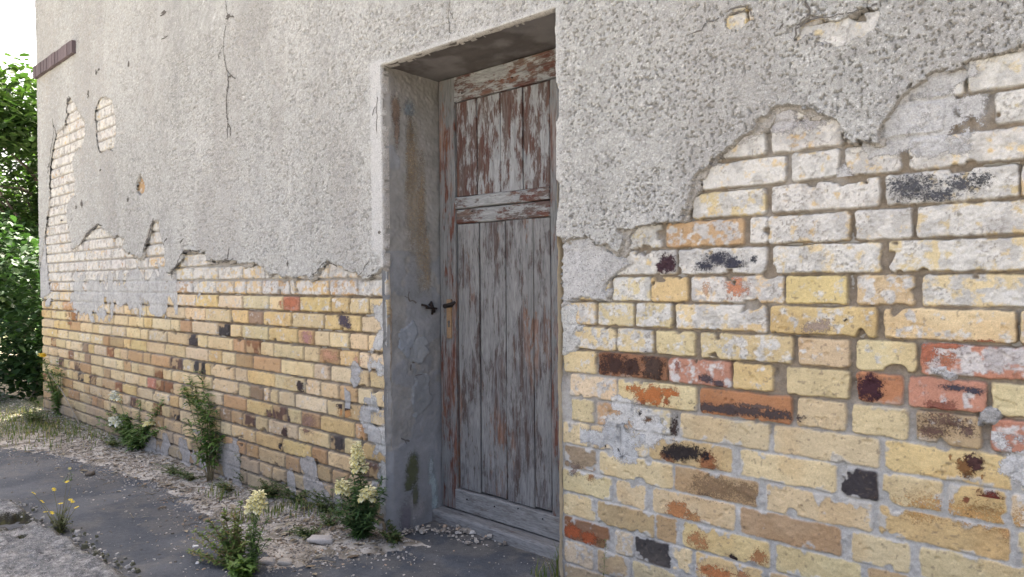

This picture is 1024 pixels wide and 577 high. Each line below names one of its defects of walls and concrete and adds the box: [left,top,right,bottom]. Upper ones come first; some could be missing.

flaking render [66,90,118,153]
crack [218,2,236,140]
flaking render [559,42,1024,356]
flaking render [40,240,54,307]
flaking render [61,219,178,323]
flaking render [184,248,387,282]
flaking render [344,301,429,409]
peeling [300,456,317,483]
flaking render [367,390,388,530]
peeling [606,394,646,458]